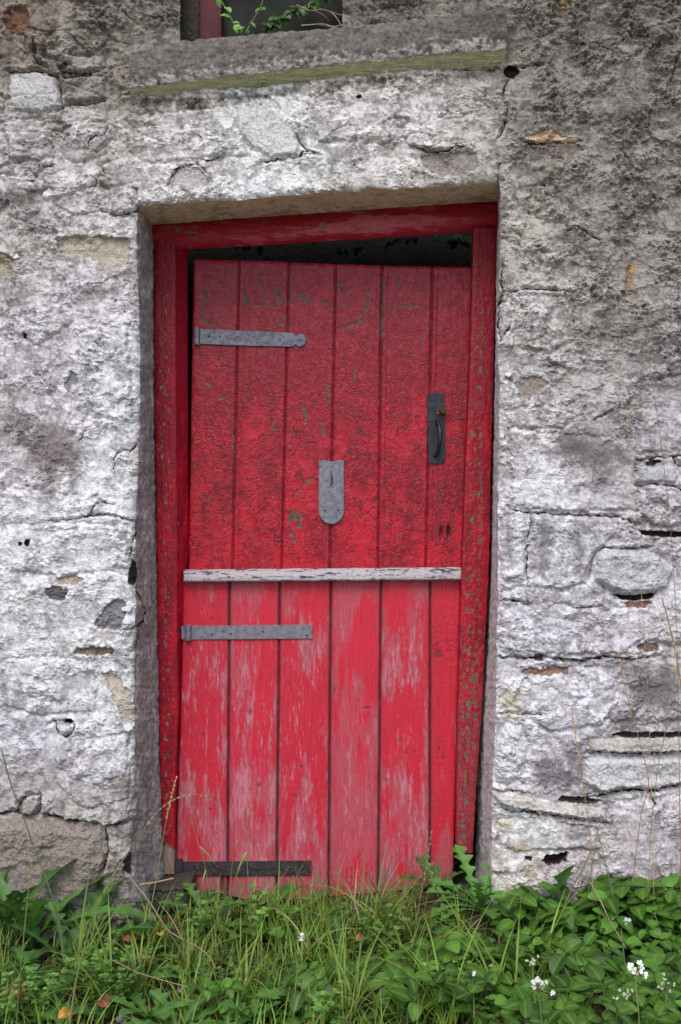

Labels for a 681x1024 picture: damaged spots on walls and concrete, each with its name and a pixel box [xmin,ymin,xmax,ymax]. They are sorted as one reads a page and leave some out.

crack [498,64,580,145]
spalling [523,129,583,157]
spalling [57,228,132,273]
spalling [43,574,83,601]
spalling [74,599,135,731]
spalling [519,653,568,676]